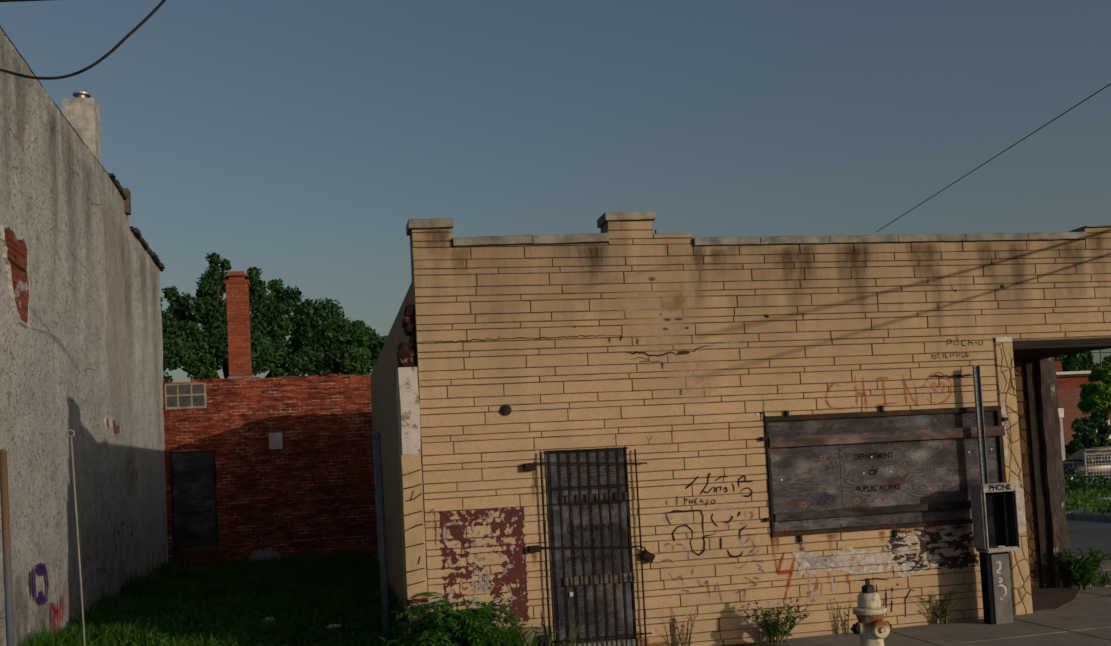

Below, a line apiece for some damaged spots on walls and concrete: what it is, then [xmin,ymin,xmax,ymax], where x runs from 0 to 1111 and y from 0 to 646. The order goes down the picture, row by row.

flaking render [0,224,30,329]
crack [418,335,741,363]
peeling [408,506,552,646]
peeling [792,524,979,577]